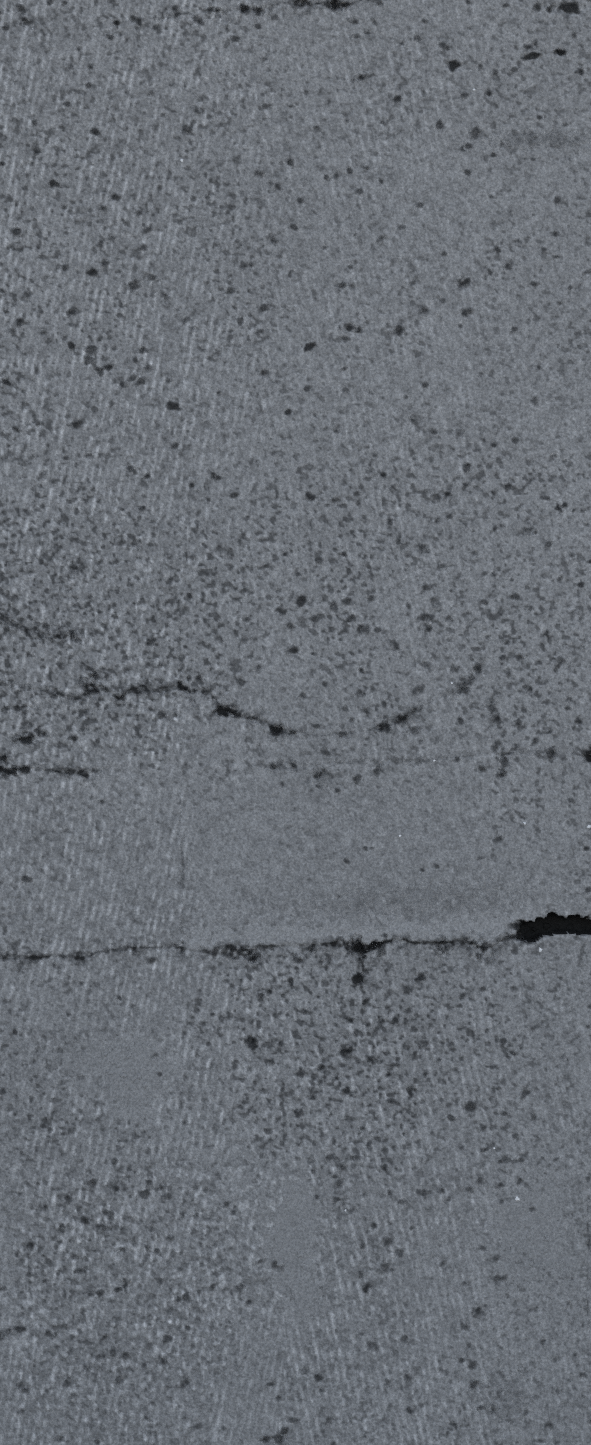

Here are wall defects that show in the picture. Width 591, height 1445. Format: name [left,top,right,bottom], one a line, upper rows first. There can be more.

spalling [511,912,591,942]
crack [3,944,274,961]
crack [311,935,531,972]